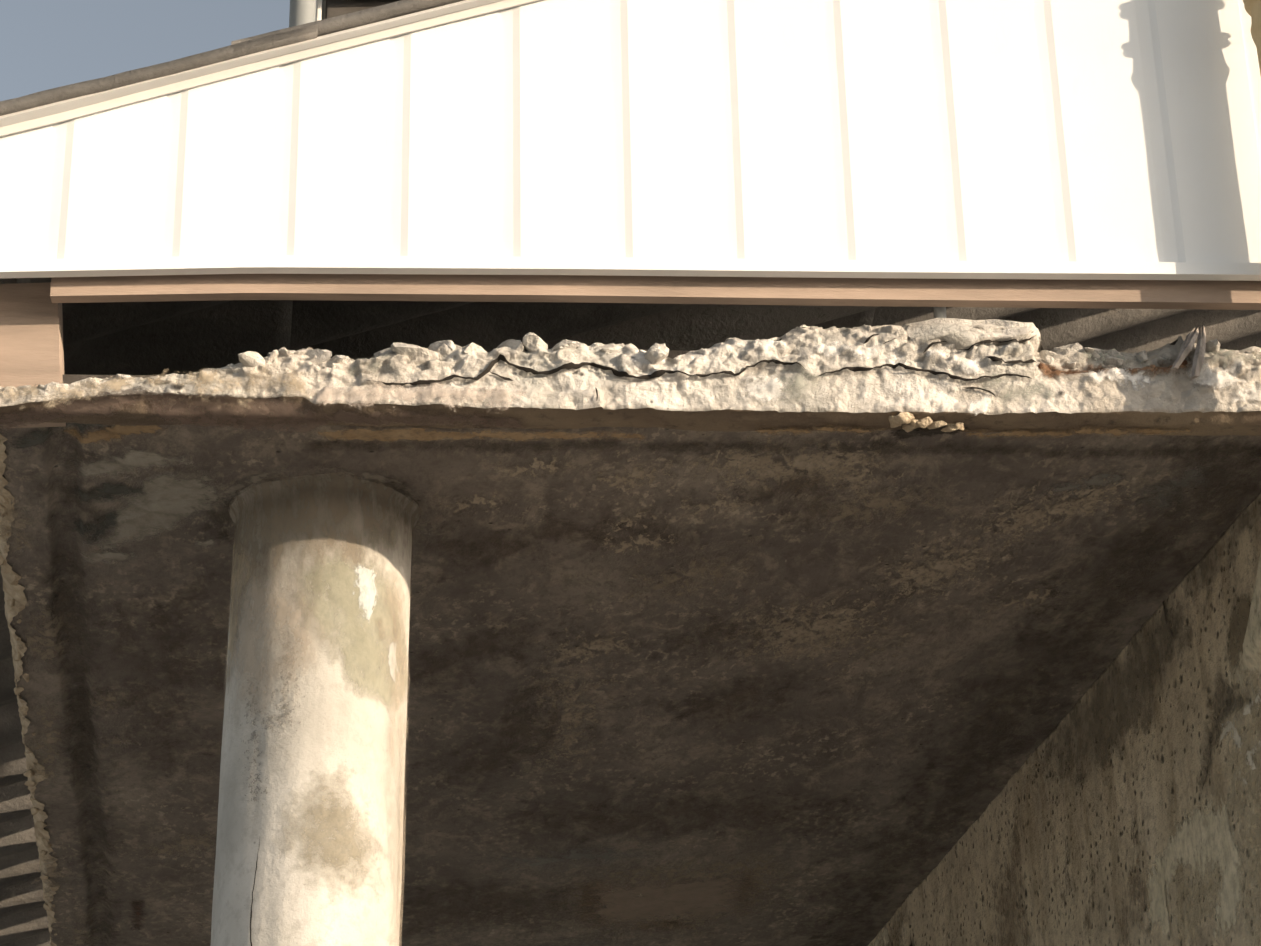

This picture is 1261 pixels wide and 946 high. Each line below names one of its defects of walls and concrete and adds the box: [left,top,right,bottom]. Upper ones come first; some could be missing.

spalling [203,351,272,374]
spalling [288,348,345,365]
spalling [374,332,579,360]
spalling [644,343,669,365]
crack [366,334,1036,400]
peeling [906,318,1188,378]
water stain [62,451,145,544]
water stain [214,473,422,693]
spalling [0,434,60,946]
water stain [809,436,1261,946]
water stain [301,786,370,883]
crack [250,839,260,946]